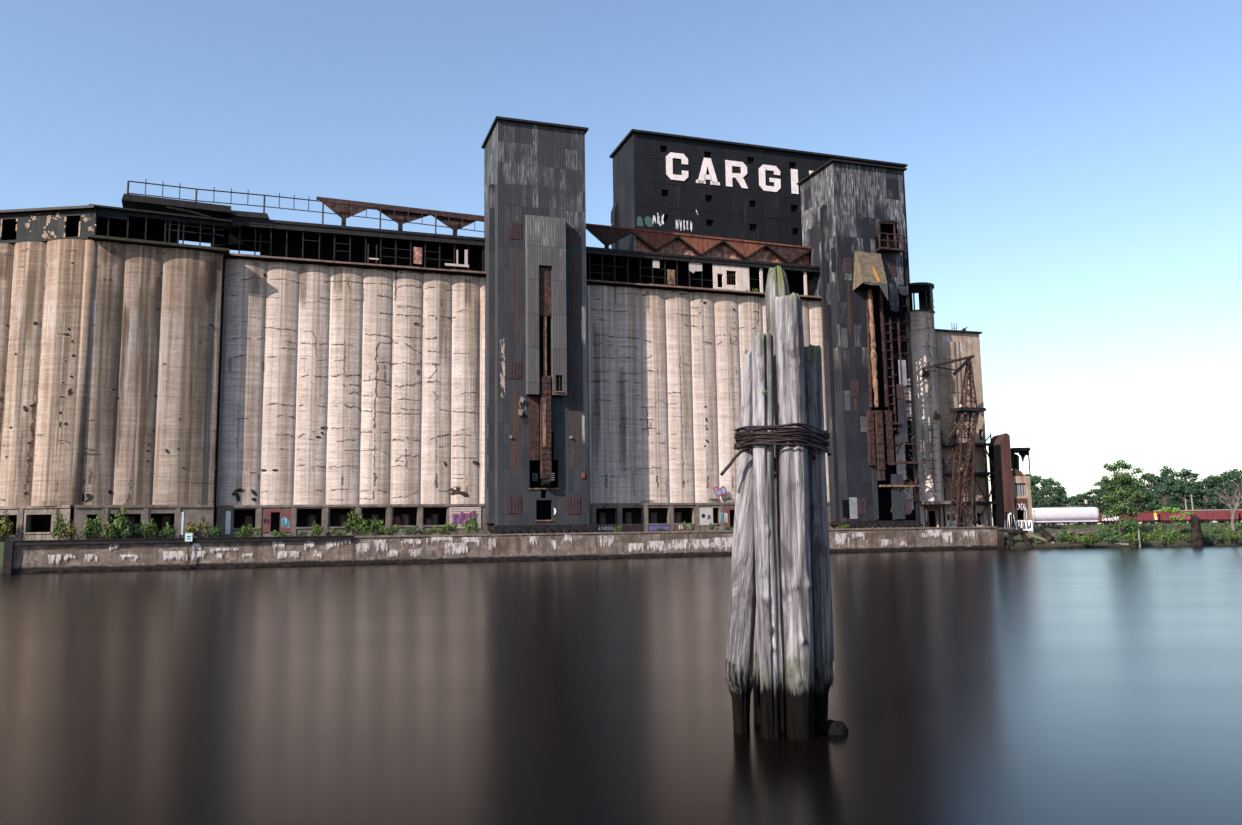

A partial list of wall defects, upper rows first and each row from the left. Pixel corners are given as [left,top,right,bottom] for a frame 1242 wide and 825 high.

damp [90,292,167,413]
crack [193,270,478,501]
crack [591,291,759,495]